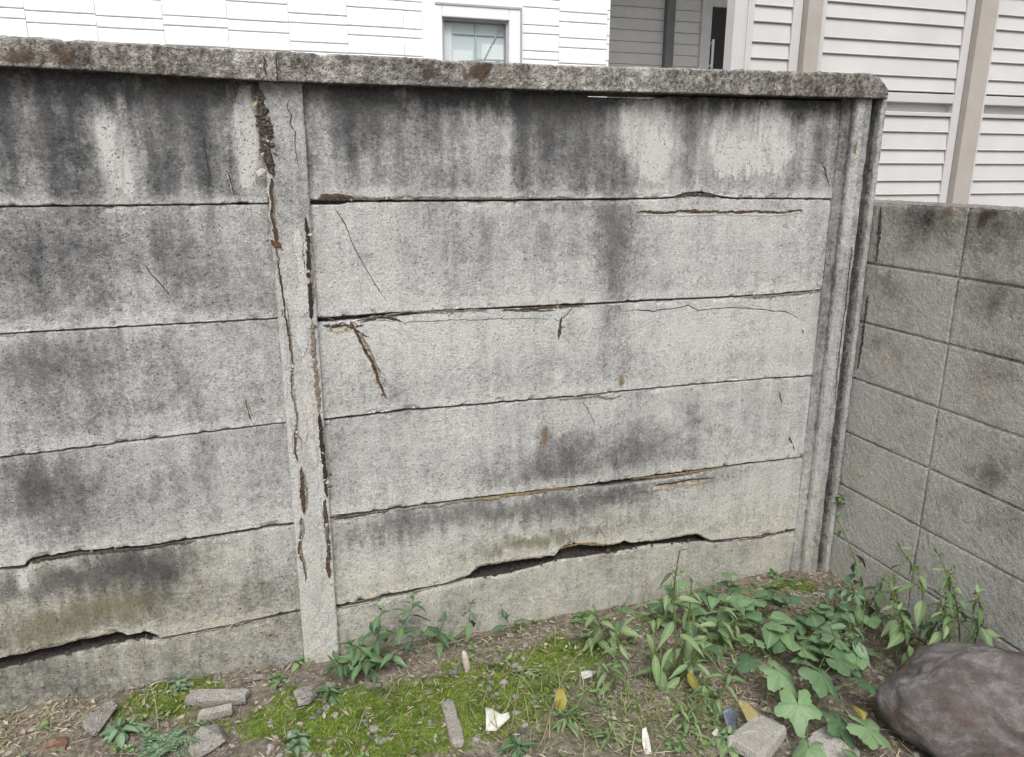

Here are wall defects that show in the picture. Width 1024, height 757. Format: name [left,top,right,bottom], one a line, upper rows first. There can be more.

leakage [93,114,136,202]
leakage [233,85,261,194]
leakage [618,100,675,186]
leakage [706,105,796,184]
crack [638,209,803,217]
crack [335,209,541,399]
crack [267,177,408,583]
leakage [17,554,30,593]